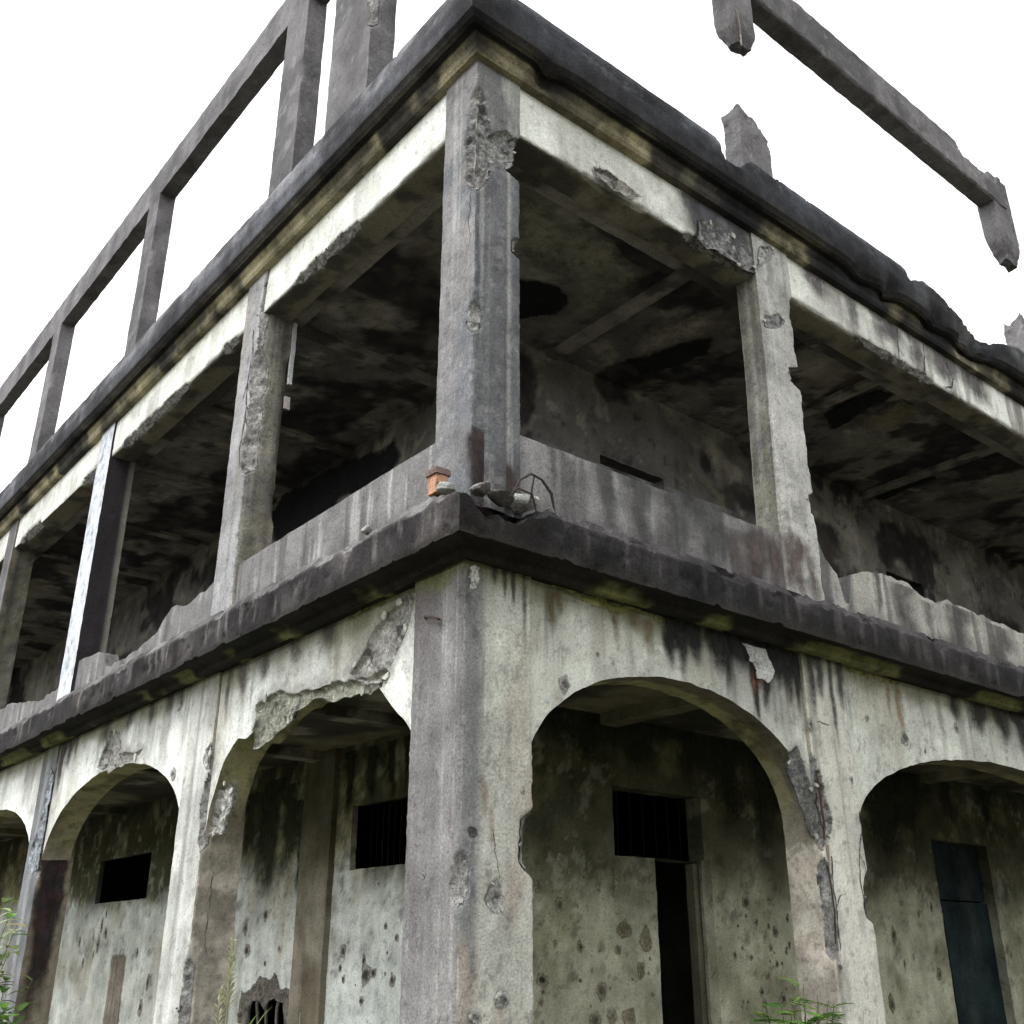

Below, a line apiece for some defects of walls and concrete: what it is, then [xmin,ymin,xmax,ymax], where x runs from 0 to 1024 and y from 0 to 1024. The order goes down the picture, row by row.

spalling [464,84,518,190]
spalling [593,165,641,199]
leakage [519,280,568,319]
leakage [597,463,616,526]
leakage [629,475,726,565]
spalling [251,593,414,749]
leakage [663,616,843,728]
flaking render [742,643,775,683]
leakage [970,701,1024,745]
spalling [197,740,238,852]
leakage [243,777,304,887]
spalling [786,746,843,972]